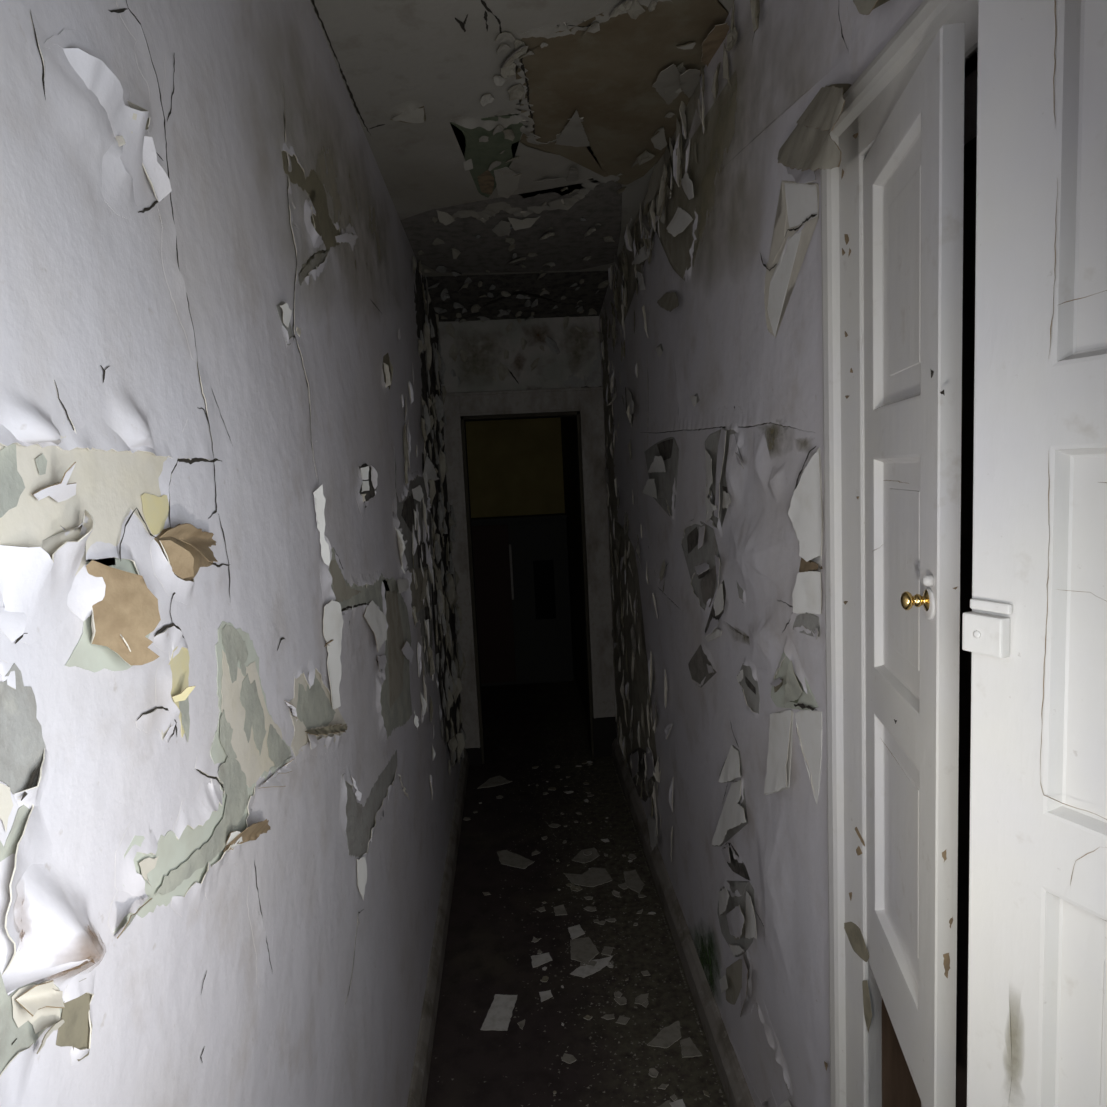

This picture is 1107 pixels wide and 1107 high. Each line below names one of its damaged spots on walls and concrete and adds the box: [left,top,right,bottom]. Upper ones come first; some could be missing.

crack [29,9,47,100]
peeling [43,29,172,219]
peeling [0,414,218,742]
crack [109,0,231,594]
crack [311,0,385,135]
peeling [108,0,747,939]
peeling [736,446,824,805]
peeling [760,84,851,338]
peeling [0,659,96,1107]
peeling [712,725,793,1107]